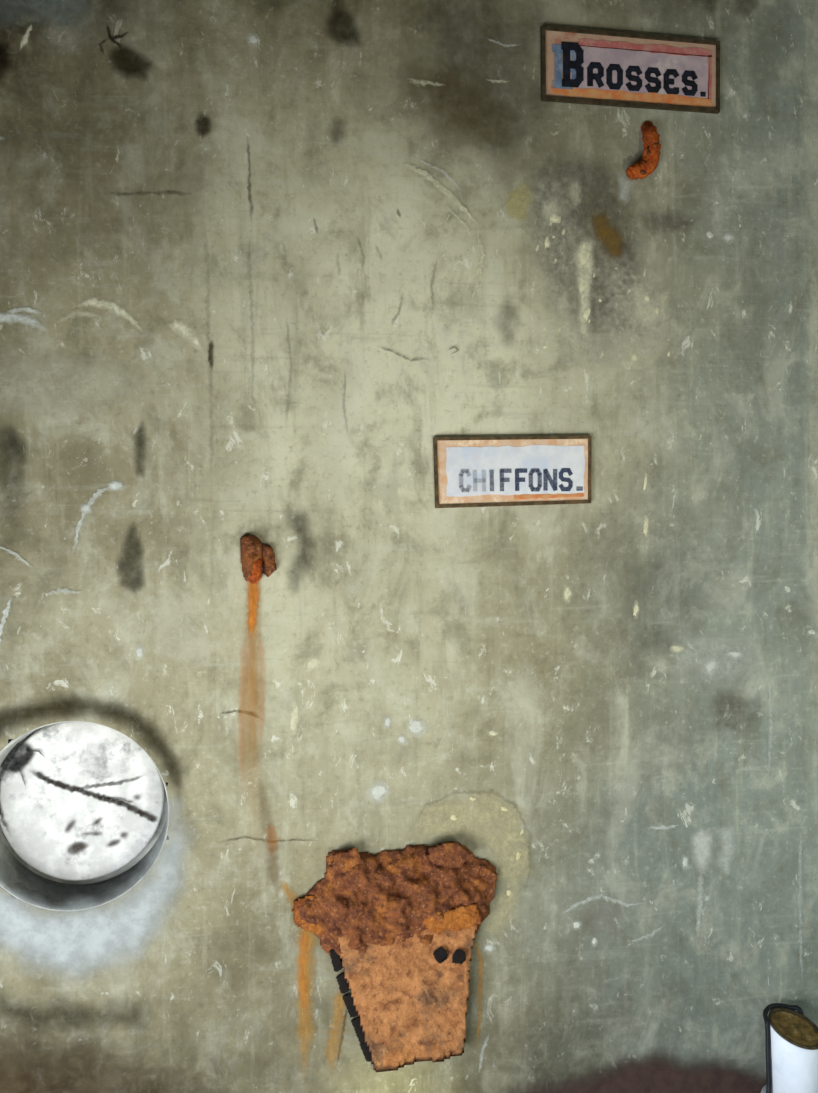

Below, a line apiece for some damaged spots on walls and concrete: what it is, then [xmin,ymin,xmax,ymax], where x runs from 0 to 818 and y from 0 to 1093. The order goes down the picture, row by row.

water stain [329,8,357,42]
water stain [119,531,141,591]
rust [248,581,258,647]
rust [299,930,312,1038]
rust [328,949,372,1062]